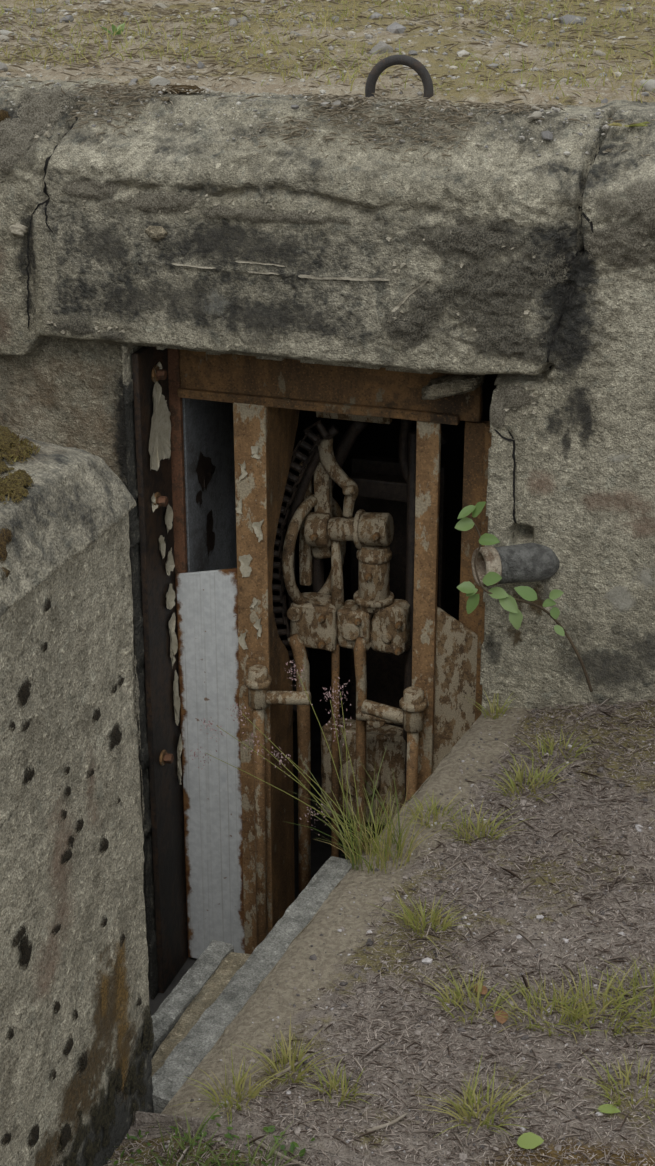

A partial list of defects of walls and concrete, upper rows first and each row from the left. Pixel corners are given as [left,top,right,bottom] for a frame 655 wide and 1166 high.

crack [0,113,78,327]
crack [568,192,594,268]
crack [547,301,569,370]
peeling [149,362,171,471]
peeling [196,451,216,557]
peeling [239,554,252,578]
peeling [238,446,261,481]
peeling [252,519,264,542]
leakage [545,333,595,456]
peeling [151,494,182,785]
peeling [238,598,262,650]
rust [35,941,137,1166]